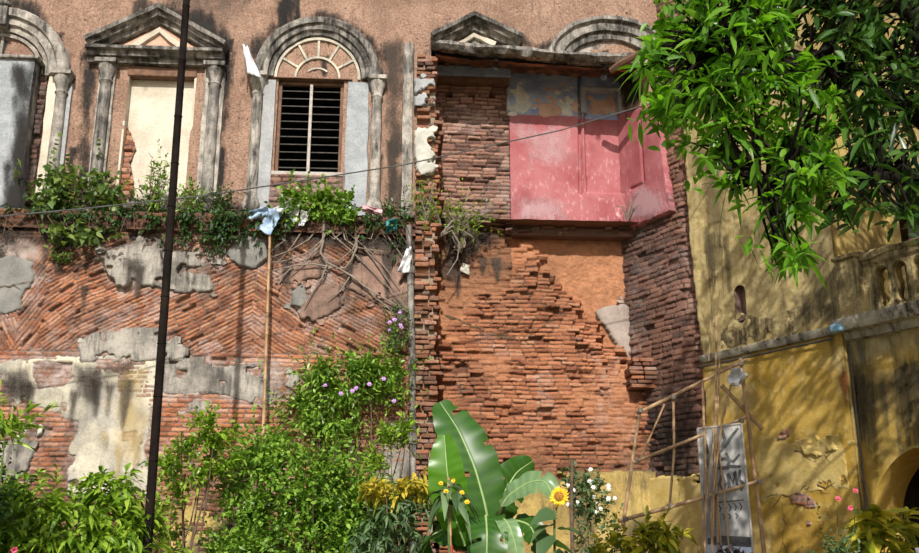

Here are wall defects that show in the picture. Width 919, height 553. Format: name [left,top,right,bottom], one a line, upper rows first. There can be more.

leakage [250,0,300,58]
peeling [506,81,617,118]
leakage [2,62,27,209]
leakage [0,369,34,413]
leakage [70,363,141,477]
leakage [853,363,919,459]
flaking render [780,492,816,509]